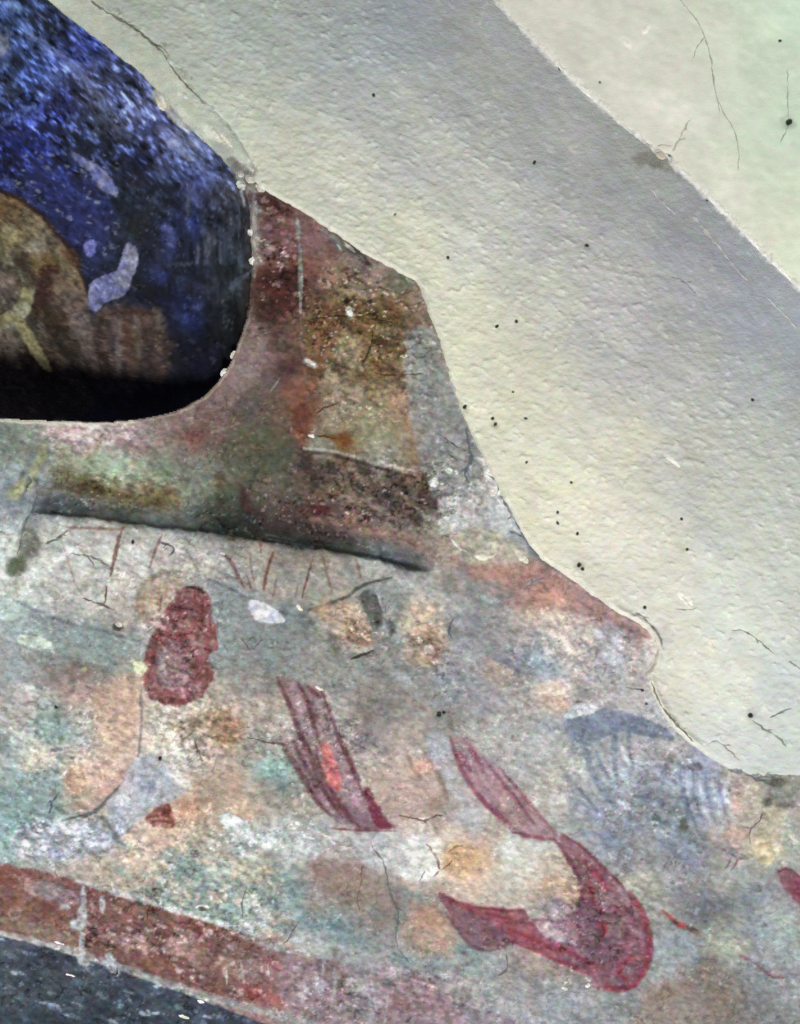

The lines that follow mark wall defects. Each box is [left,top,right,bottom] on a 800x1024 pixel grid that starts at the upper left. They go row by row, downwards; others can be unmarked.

crack [92,1,203,103]
crack [636,682,779,781]